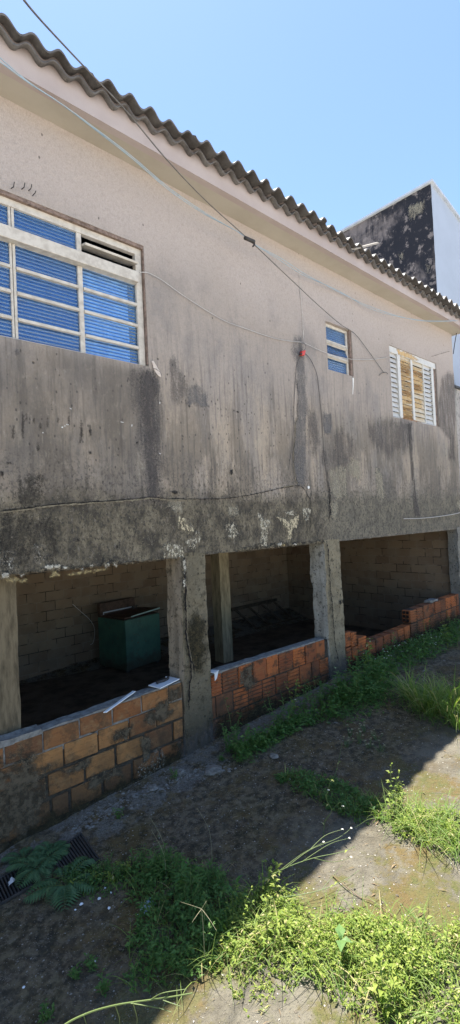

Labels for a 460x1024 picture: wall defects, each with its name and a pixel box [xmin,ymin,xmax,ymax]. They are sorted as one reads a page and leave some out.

water stain [0,475,58,573]
water stain [141,371,158,497]
crack [0,383,339,660]
water stain [258,508,311,546]
water stain [293,339,307,485]
water stain [408,424,420,517]
crack [183,558,195,708]